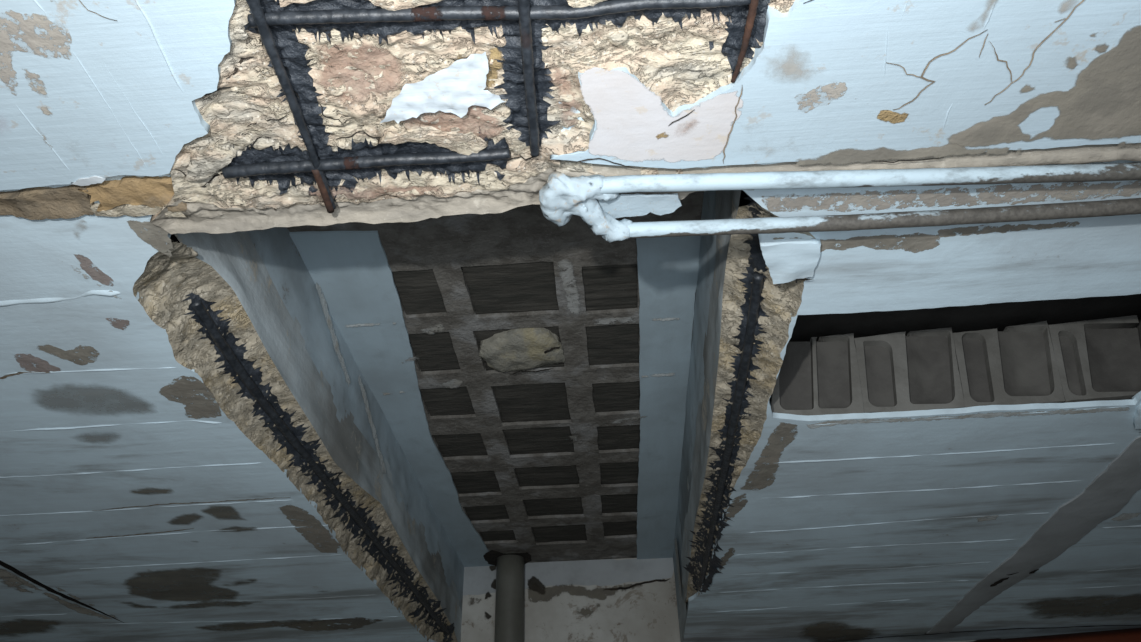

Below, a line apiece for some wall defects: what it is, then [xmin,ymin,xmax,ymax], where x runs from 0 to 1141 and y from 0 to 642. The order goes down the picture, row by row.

rust [410,6,444,22]
crack [886,0,1084,110]
peeling [773,221,1080,253]
spalling [0,0,795,642]
damp [39,387,149,412]
spalling [686,234,1141,602]
crack [0,560,124,623]
damp [126,568,256,609]
damp [1030,594,1141,618]